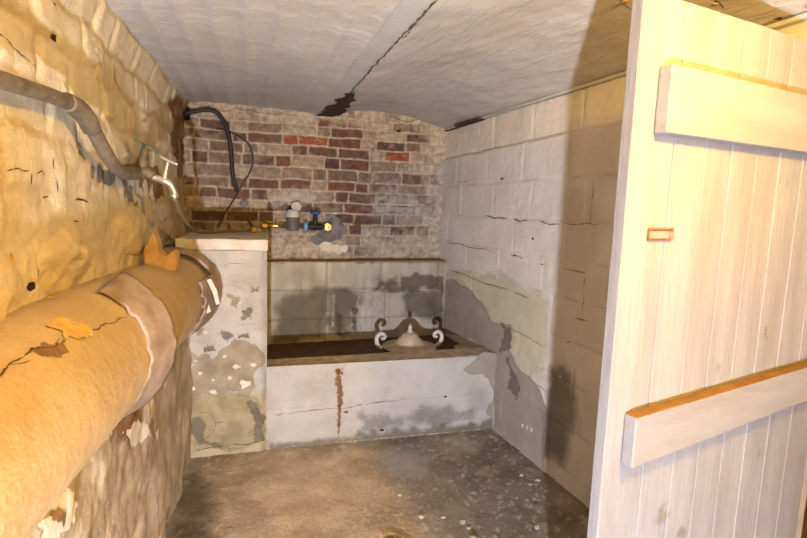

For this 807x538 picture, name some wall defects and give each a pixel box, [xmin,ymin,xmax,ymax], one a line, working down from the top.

crack [6,158,58,198]
peeling [226,293,241,308]
damp [274,289,360,343]
peeling [191,340,265,402]
corrosion [335,368,343,433]
damp [376,272,574,469]